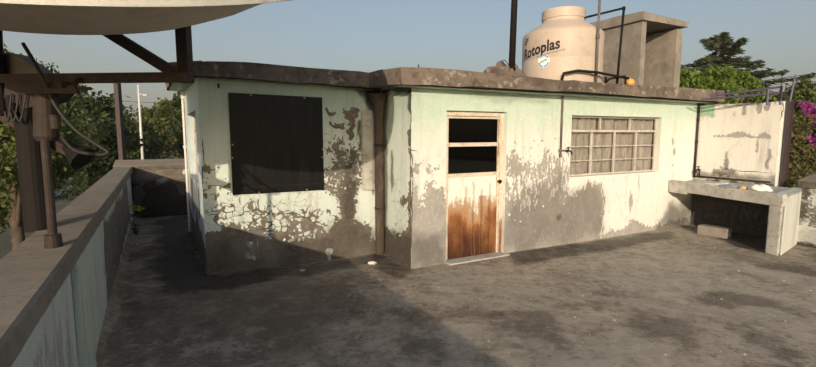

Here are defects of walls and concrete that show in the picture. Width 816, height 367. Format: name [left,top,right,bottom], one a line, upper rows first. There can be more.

crack [201,138,316,239]
peeling [190,107,376,276]
peeling [385,129,446,269]
corrosion [447,195,502,260]
peeling [504,138,690,254]
peeling [710,159,737,178]
peeling [713,131,771,153]
peeling [799,188,816,232]